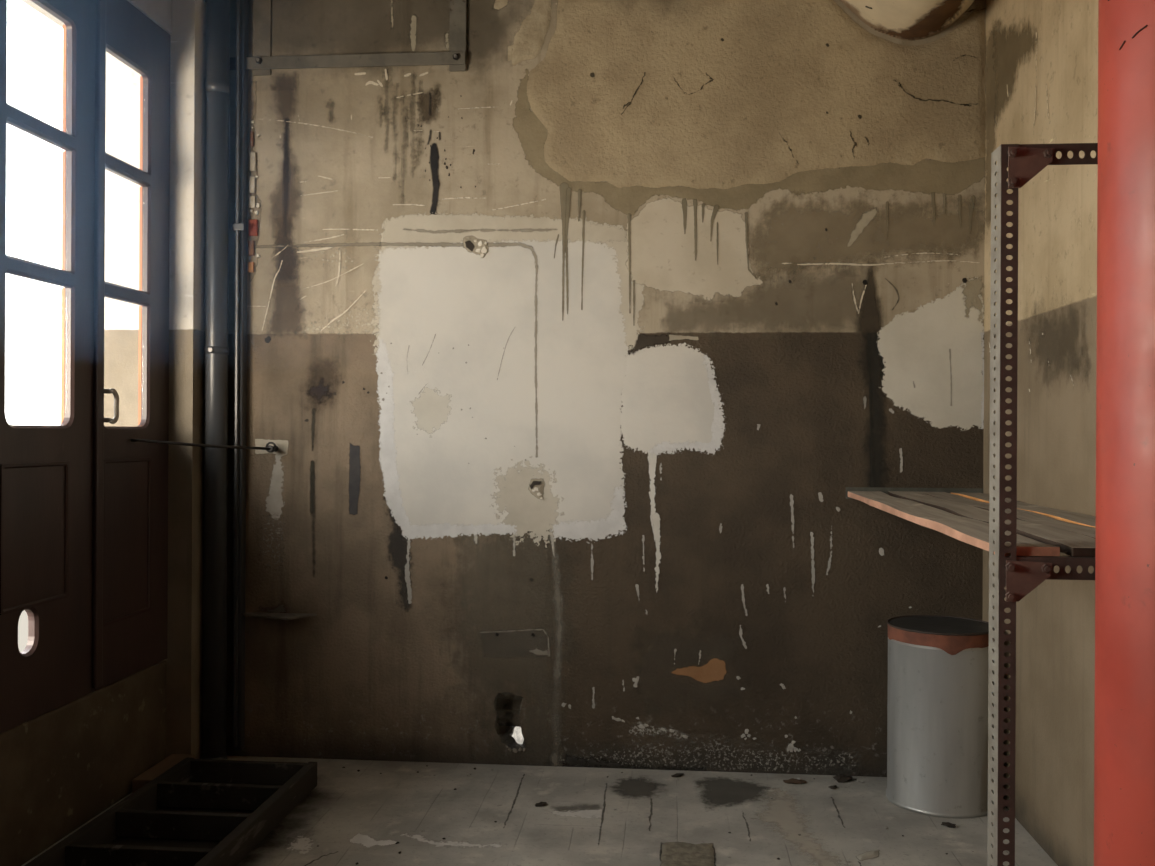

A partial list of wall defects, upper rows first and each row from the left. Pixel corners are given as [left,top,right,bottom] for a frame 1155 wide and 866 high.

crack [895,80,978,107]
flaking render [463,236,488,258]
water stain [554,183,585,320]
water stain [682,199,719,264]
flaking render [528,479,545,499]
water stain [580,737,855,806]